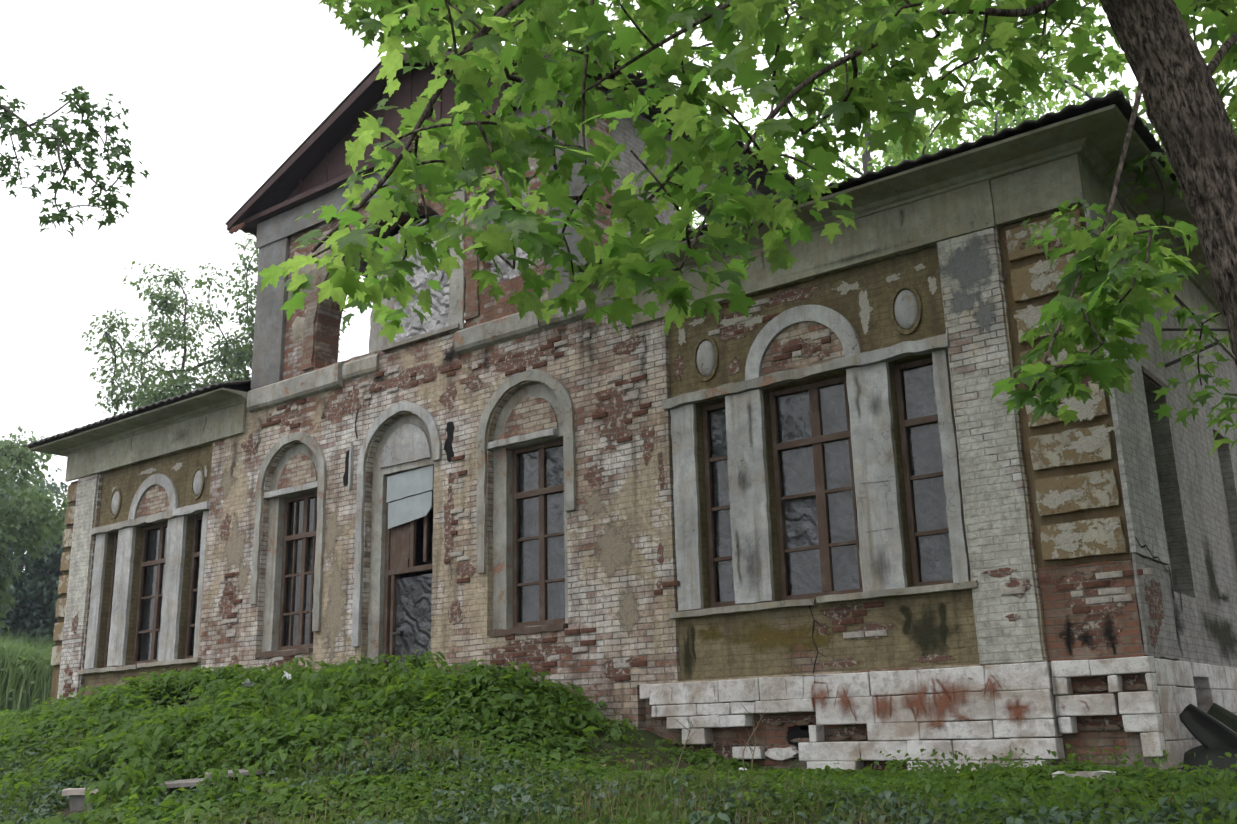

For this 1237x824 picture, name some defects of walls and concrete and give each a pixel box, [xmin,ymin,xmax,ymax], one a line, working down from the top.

peeling [674,281,874,381]
peeling [592,374,664,490]
peeling [1050,380,1117,454]
peeling [218,512,250,637]
leakage [1206,546,1220,602]
crack [809,606,828,673]
leakage [900,604,948,657]
peeling [981,568,1164,653]
leakage [1204,616,1237,657]
corrosion [812,682,856,719]
corrosion [876,675,1002,727]
corrosion [1008,701,1027,721]